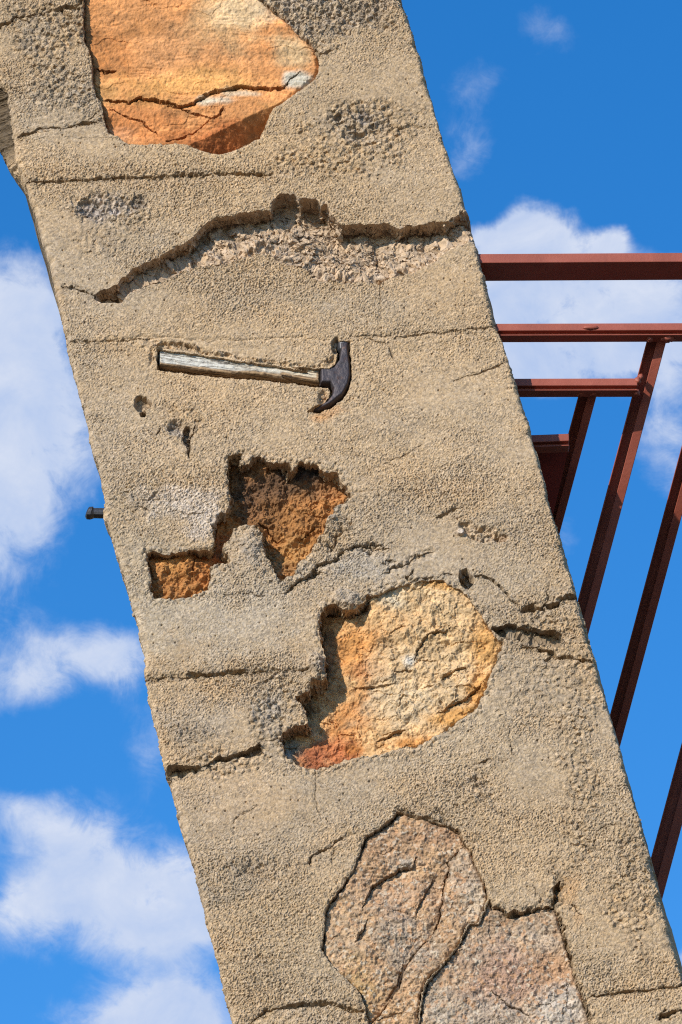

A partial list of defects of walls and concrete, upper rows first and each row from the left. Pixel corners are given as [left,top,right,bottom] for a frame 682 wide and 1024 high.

spalling [91,191,475,305]
crack [543,653,596,666]